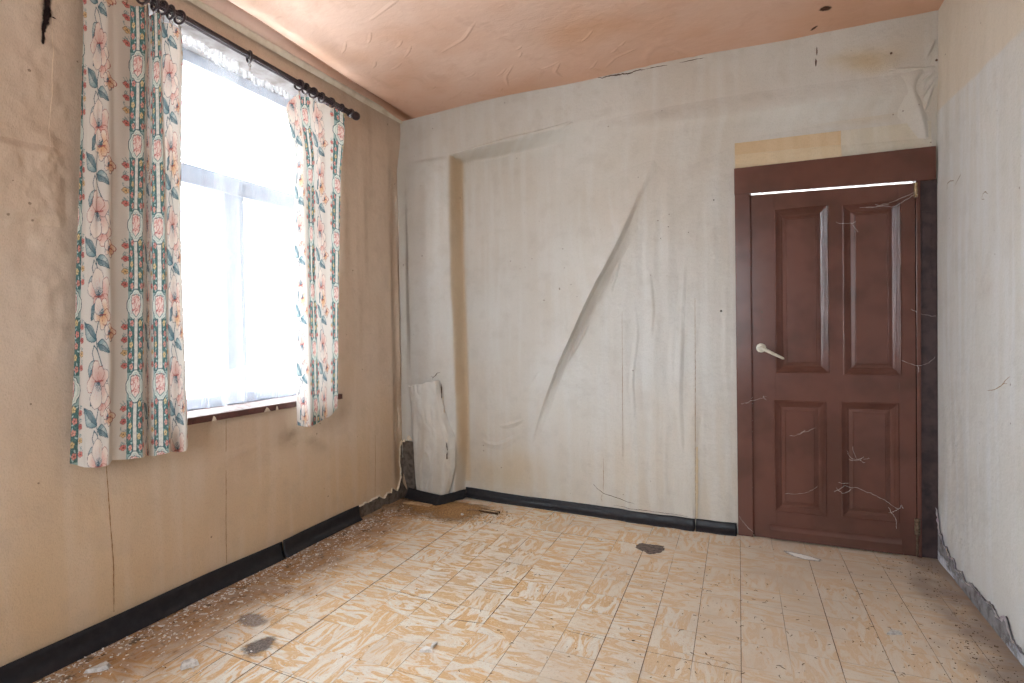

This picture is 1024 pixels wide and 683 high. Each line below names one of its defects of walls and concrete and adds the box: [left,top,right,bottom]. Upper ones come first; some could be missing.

peeling [37,440,446,683]
peeling [936,509,1024,667]